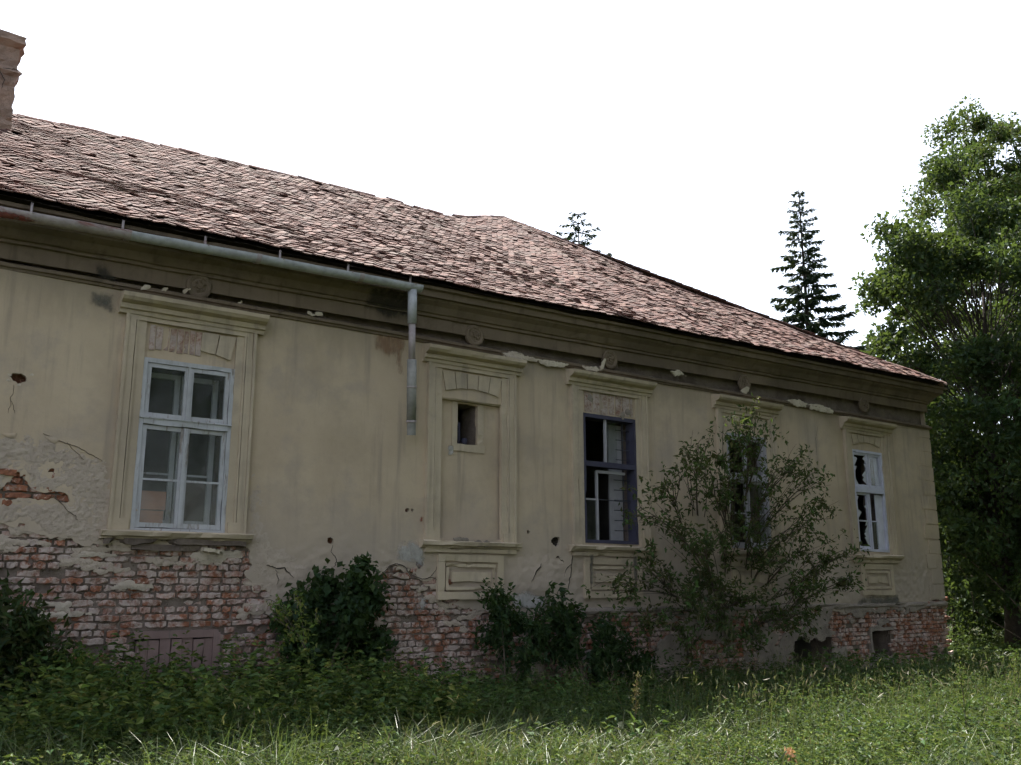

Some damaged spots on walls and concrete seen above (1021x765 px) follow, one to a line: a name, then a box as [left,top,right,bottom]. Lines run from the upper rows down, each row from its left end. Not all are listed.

spalling [6,373,34,386]
crack [43,433,102,461]
flaking render [0,468,69,506]
flaking render [0,474,350,690]
flaking render [366,555,702,692]
flaking render [670,608,816,681]
flaking render [826,597,954,666]